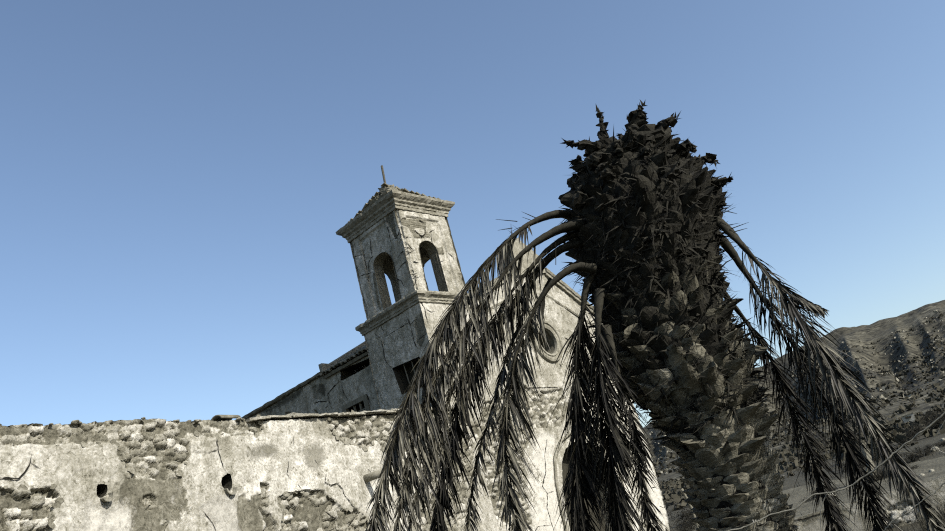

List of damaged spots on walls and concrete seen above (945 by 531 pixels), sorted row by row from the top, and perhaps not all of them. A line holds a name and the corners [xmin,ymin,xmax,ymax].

flaking render [0,414,264,531]
flaking render [237,483,370,531]
flaking render [327,386,567,531]
crack [535,441,554,531]